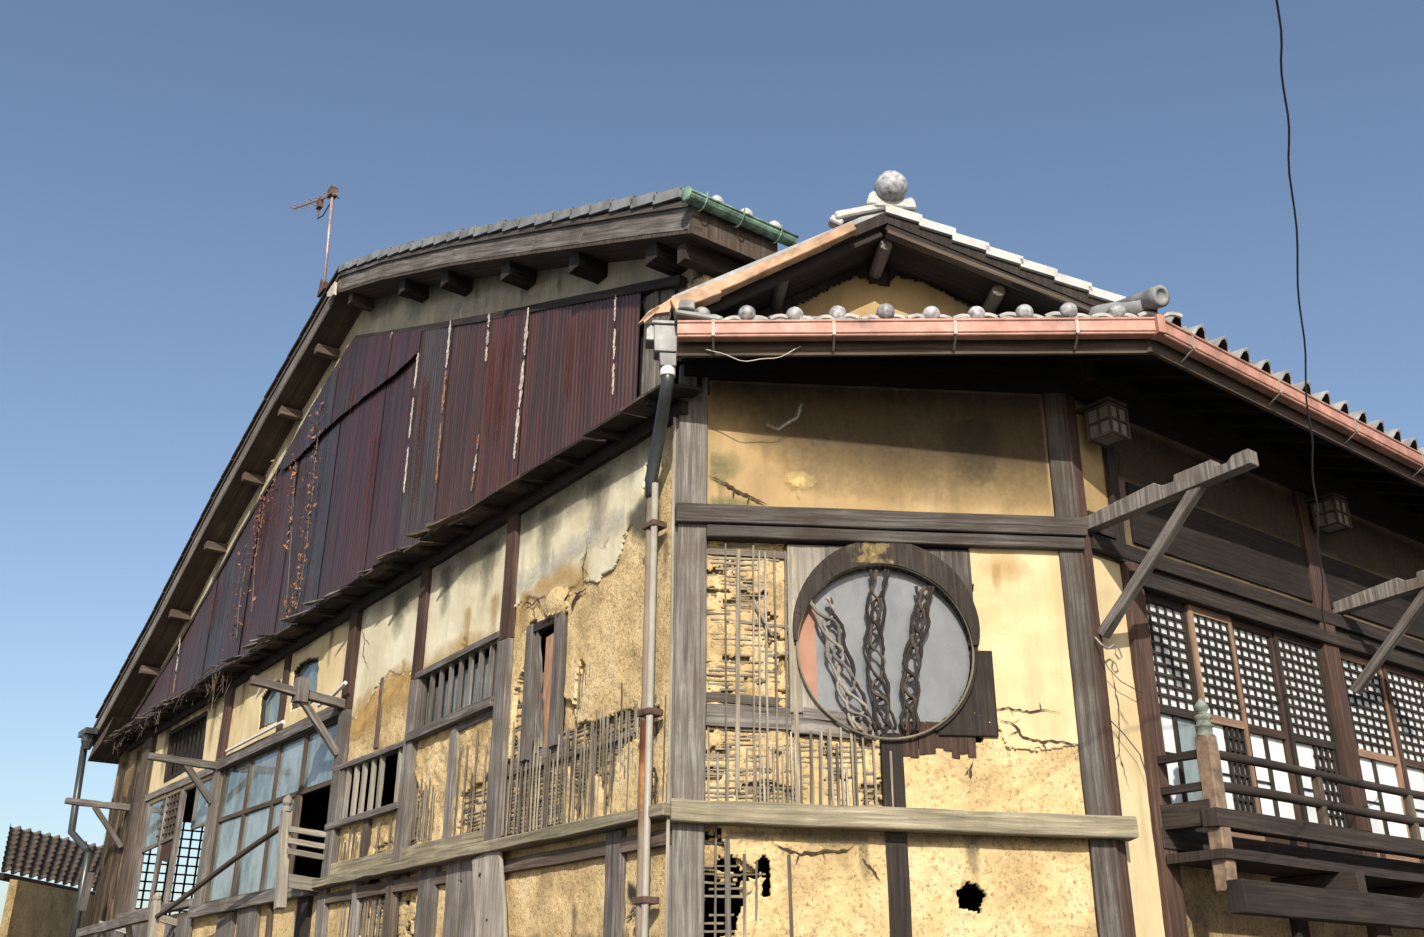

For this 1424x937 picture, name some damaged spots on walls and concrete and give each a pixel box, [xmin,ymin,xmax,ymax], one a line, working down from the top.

leakage [439,437,649,592]
leakage [517,494,659,612]
flaking render [347,671,411,762]
flaking render [508,589,551,762]
flaking render [562,425,673,824]
crack [991,702,1078,751]
crack [1112,674,1130,791]